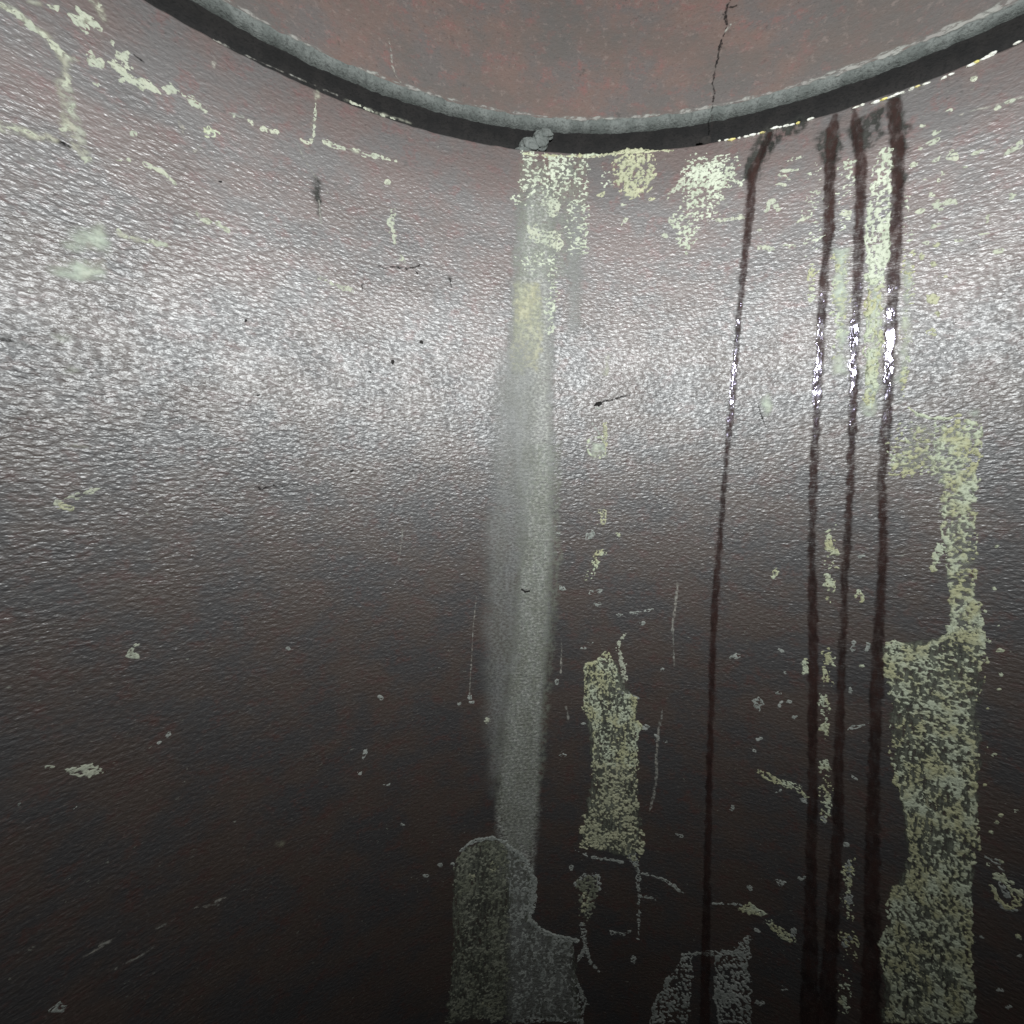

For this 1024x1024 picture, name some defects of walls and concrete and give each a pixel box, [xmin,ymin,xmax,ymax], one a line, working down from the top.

crack [710,3,737,137]
peeling [423,633,666,1024]
peeling [649,928,765,1024]
water stain [488,50,997,1024]
peeling [877,407,1024,1024]